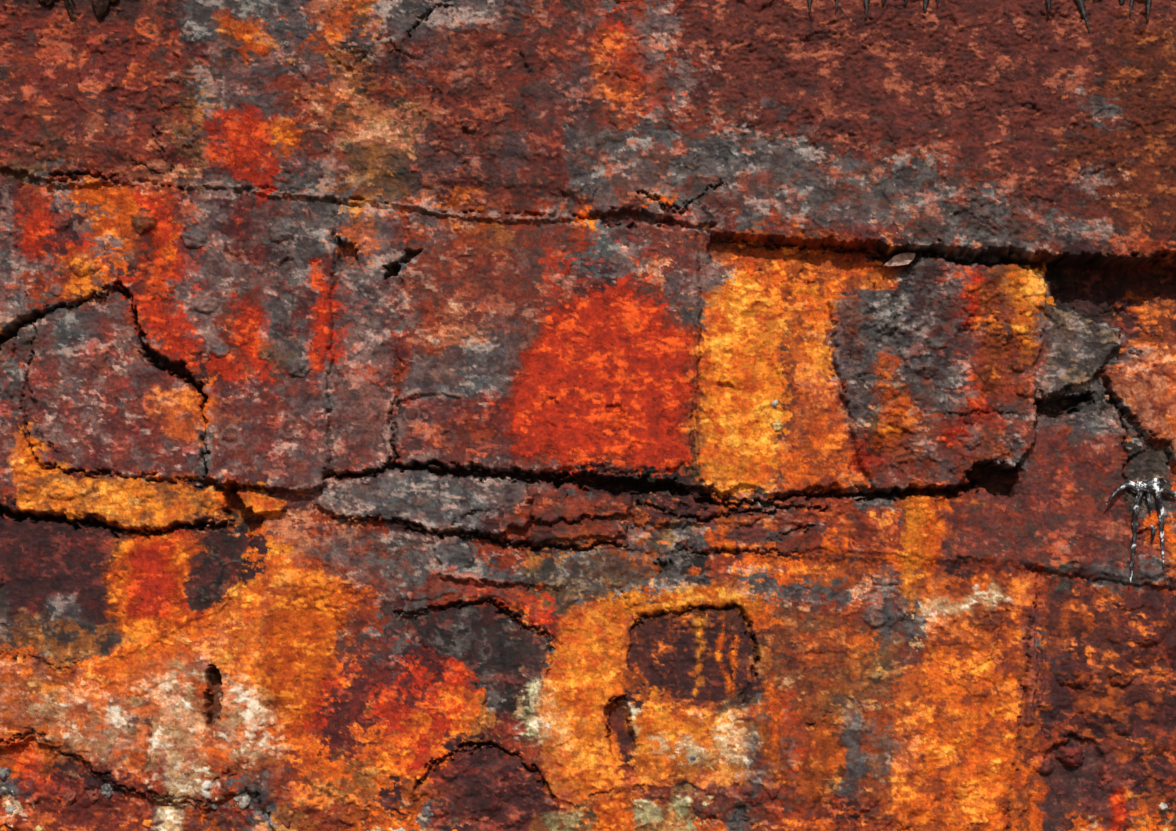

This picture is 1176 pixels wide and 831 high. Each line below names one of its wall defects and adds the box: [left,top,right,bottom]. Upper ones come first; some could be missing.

corrosion [204,106,302,180]
corrosion [64,249,100,299]
crack [0,281,277,540]
corrosion [310,258,330,375]
corrosion [502,285,694,467]
corrosion [942,265,1037,446]
crack [320,395,984,561]
corrosion [104,526,203,641]
corrosion [260,560,345,735]
corrosion [597,581,762,694]
corrosion [900,493,941,611]
spalling [0,736,276,831]